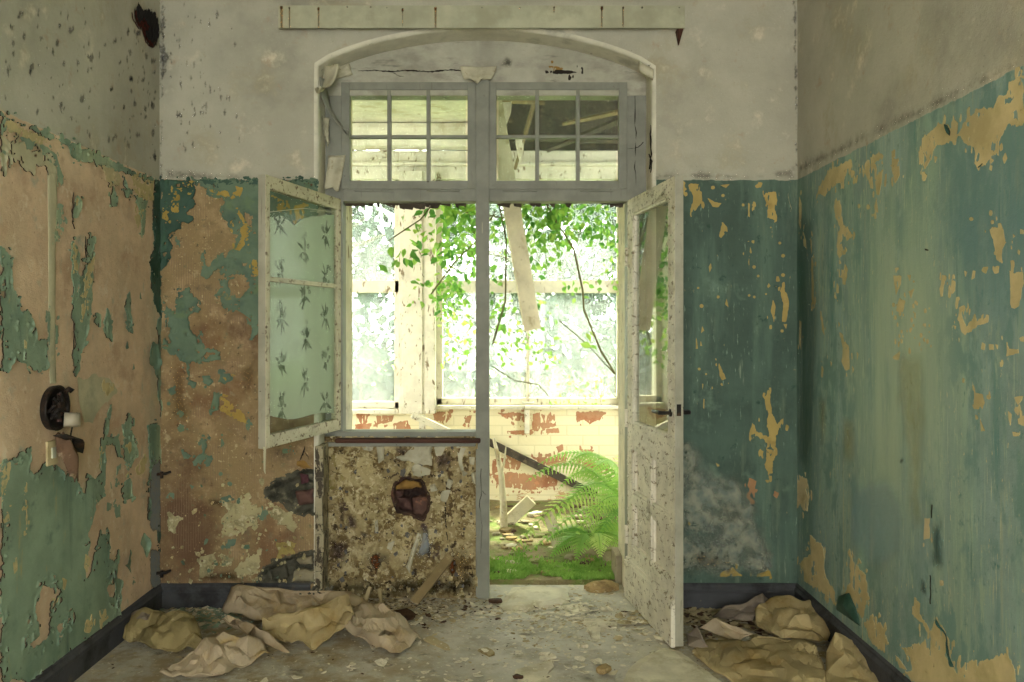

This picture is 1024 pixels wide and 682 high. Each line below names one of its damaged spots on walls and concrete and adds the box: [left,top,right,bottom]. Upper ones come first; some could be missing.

crack [360,69,461,77]
peeling [919,66,1024,181]
peeling [0,63,353,432]
peeling [939,210,1024,335]
peeling [0,404,152,682]
flaking render [263,448,318,517]
flaking render [355,414,411,429]
flaking render [362,446,476,573]
flaking render [490,409,609,494]
leakage [683,443,770,572]
peeling [745,388,789,504]
peeling [797,535,1020,682]